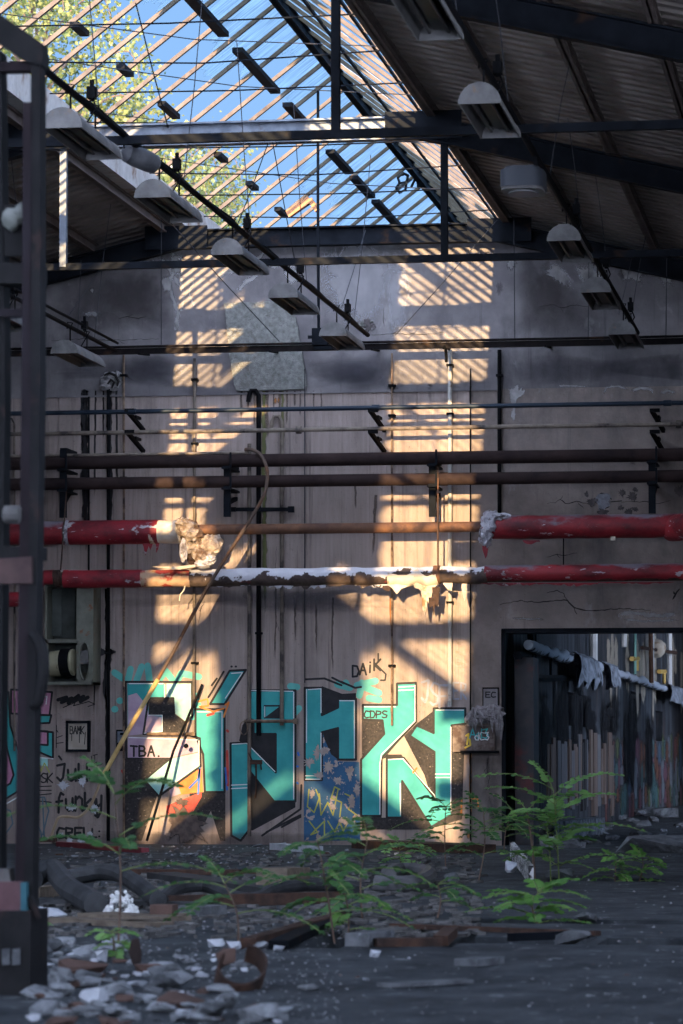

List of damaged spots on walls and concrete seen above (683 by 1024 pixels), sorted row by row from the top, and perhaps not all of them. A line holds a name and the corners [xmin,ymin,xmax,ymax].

peeling [584,487,639,515]
crack [500,590,644,614]